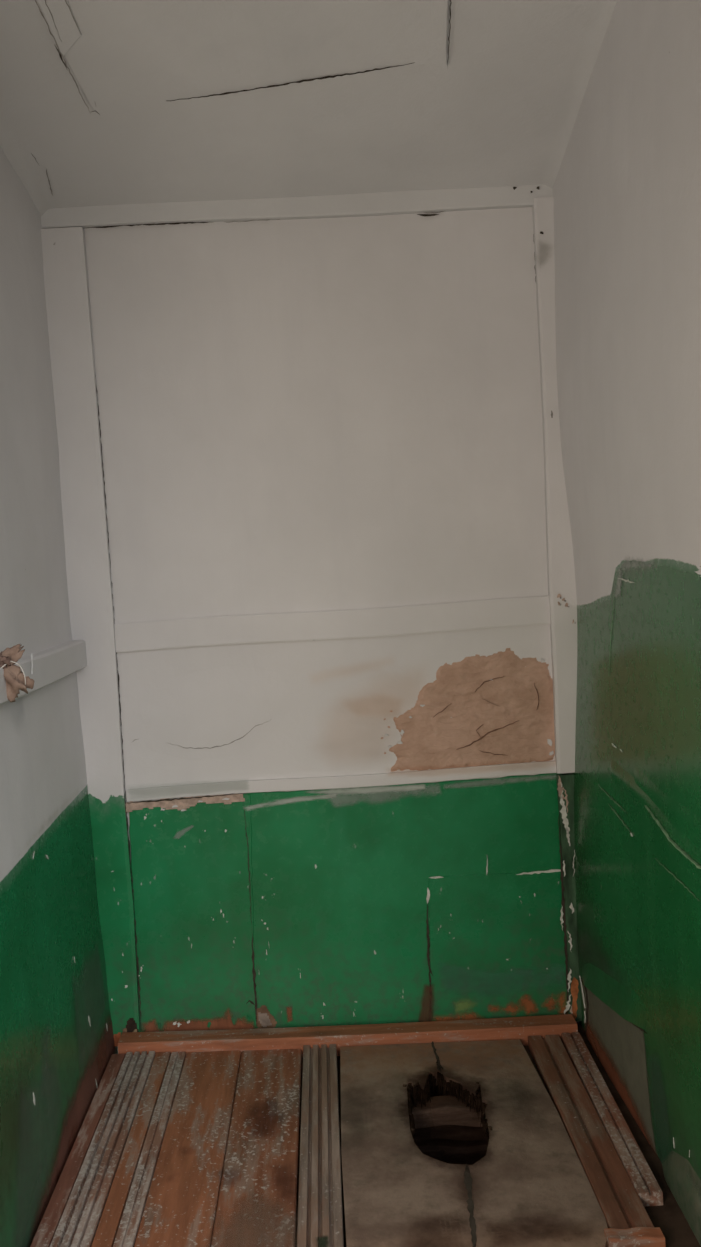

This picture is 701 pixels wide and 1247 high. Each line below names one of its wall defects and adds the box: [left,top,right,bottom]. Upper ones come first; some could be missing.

crack [35,0,100,115]
crack [171,62,415,101]
crack [445,0,453,66]
spalling [381,648,555,772]
peeling [125,793,247,844]
peeling [436,773,656,1153]